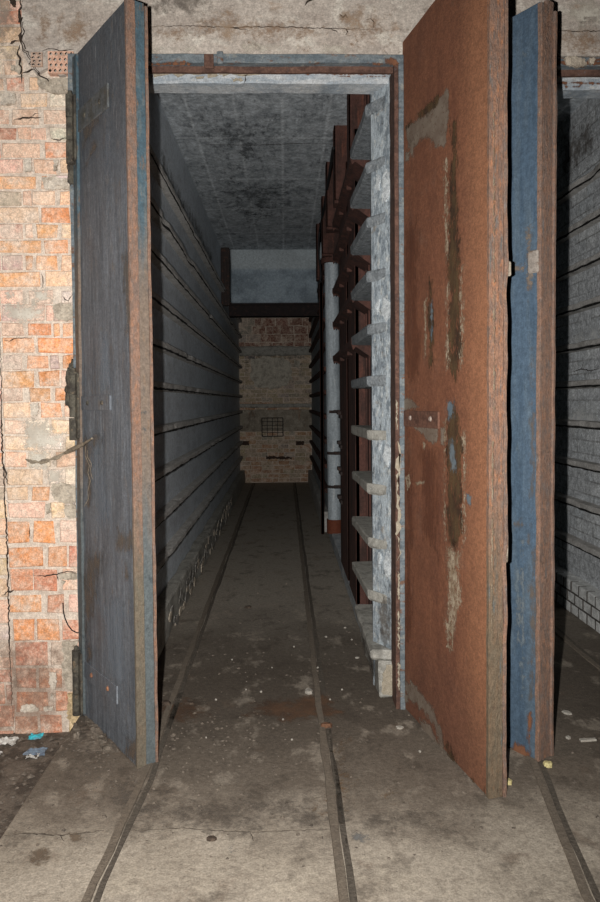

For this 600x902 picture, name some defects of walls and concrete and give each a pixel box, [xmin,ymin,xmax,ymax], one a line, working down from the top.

crack [10,0,74,82]
crack [0,337,30,720]
peeling [45,482,76,519]